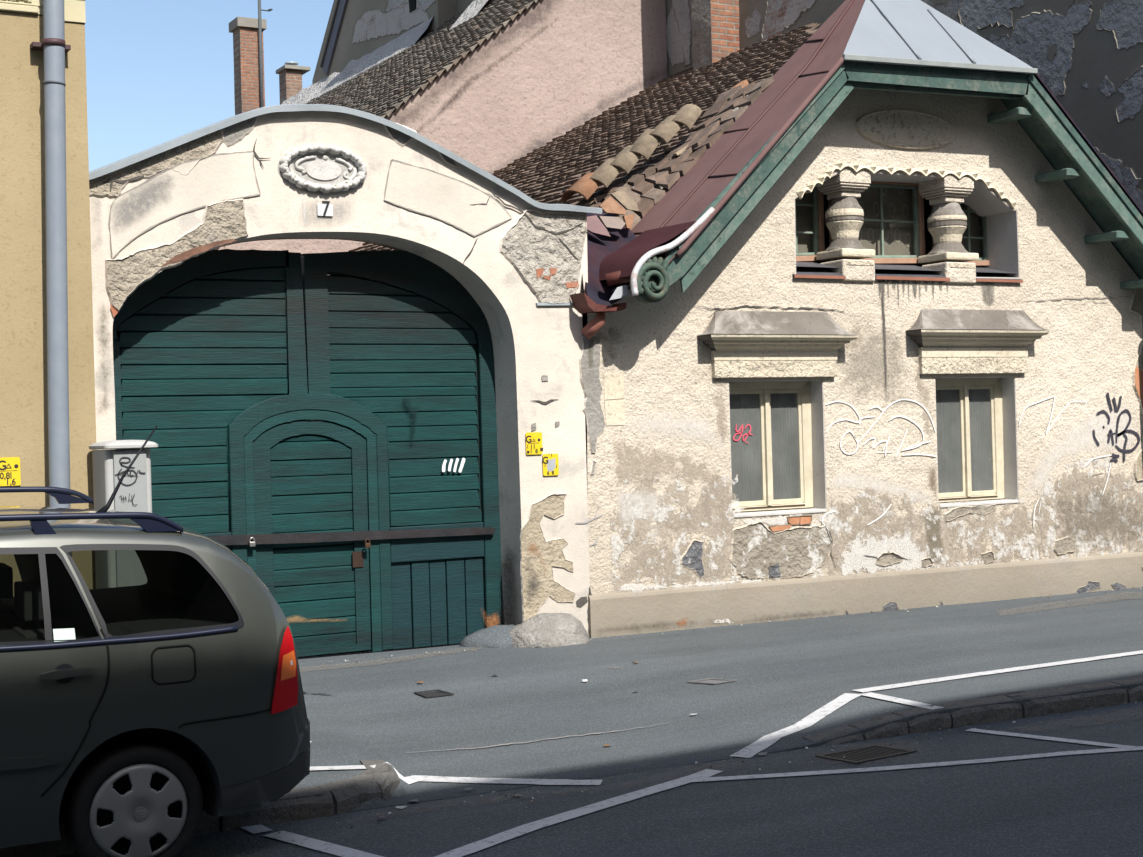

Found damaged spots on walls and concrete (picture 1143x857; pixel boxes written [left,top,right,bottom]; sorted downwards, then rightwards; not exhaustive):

flaking render [745,0,817,42]
peeling [89,116,259,198]
spalling [105,198,248,317]
spalling [499,209,587,304]
spalling [1128,288,1143,418]
spalling [520,494,588,622]
spalling [610,435,1143,591]